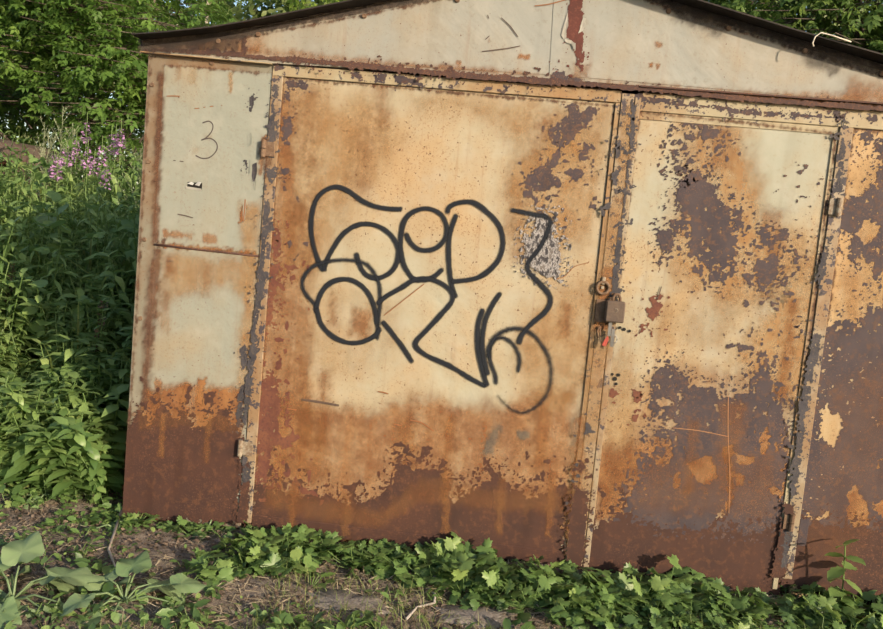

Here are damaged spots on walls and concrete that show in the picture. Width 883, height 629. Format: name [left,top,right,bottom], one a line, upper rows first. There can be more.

peeling [331,68,425,91]
corrosion [122,34,883,606]
peeling [512,0,883,571]